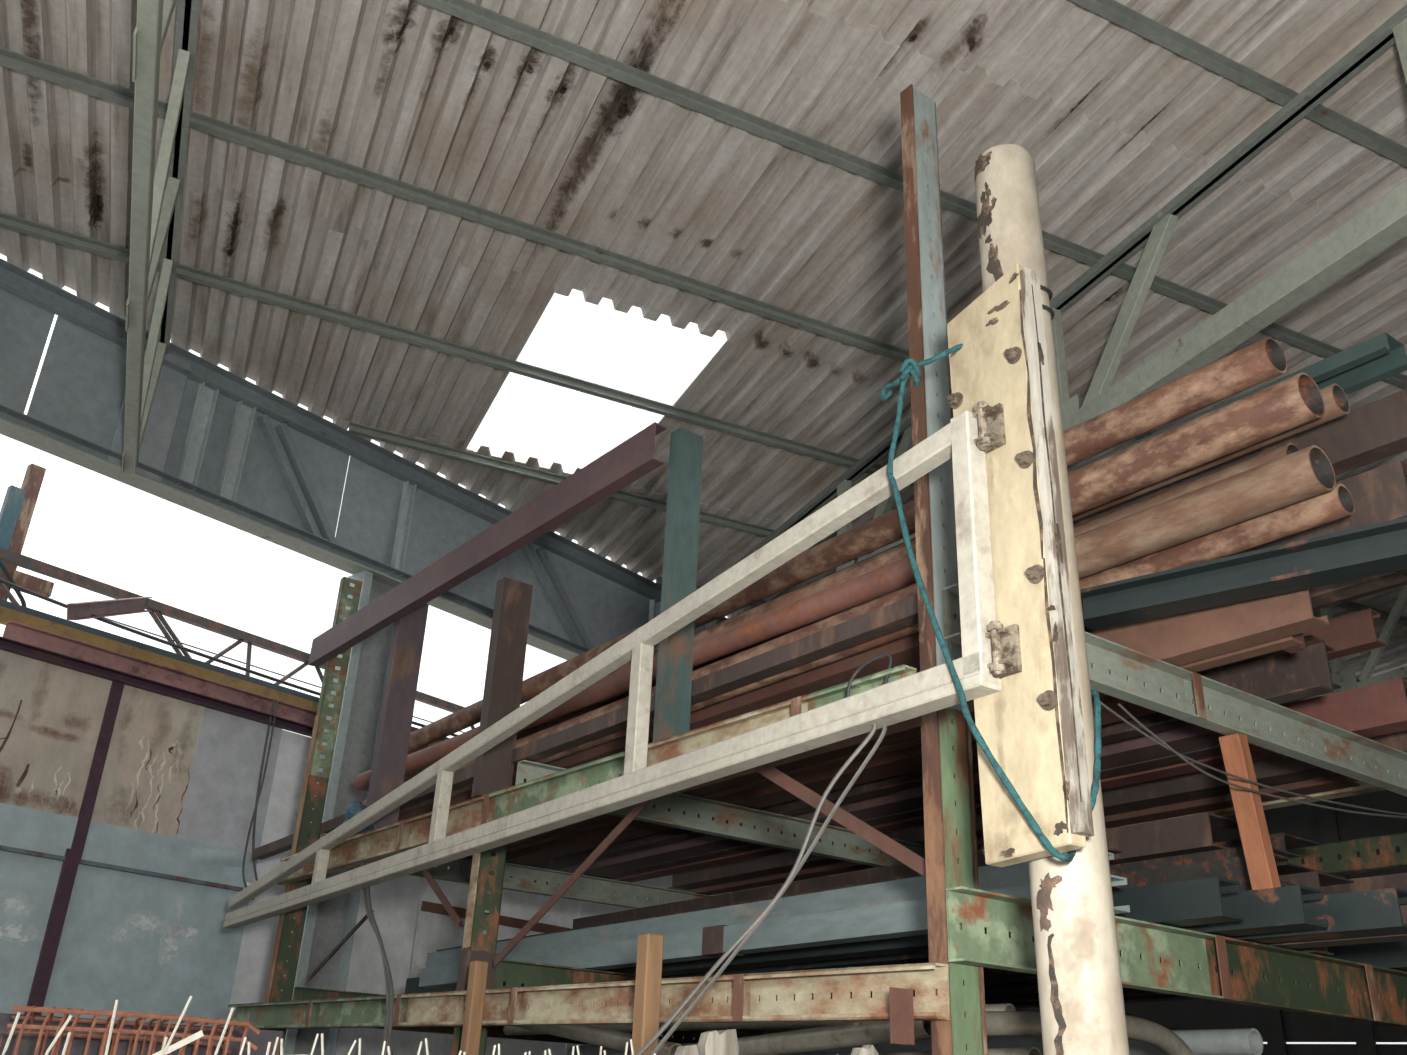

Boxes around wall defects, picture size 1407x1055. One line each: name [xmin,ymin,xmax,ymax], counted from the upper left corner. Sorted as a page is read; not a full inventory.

damp [629,0,684,73]
damp [547,66,574,103]
damp [85,141,104,227]
damp [543,80,642,247]
peeling [974,151,1019,283]
peeling [986,300,1010,327]
peeling [1036,873,1062,931]